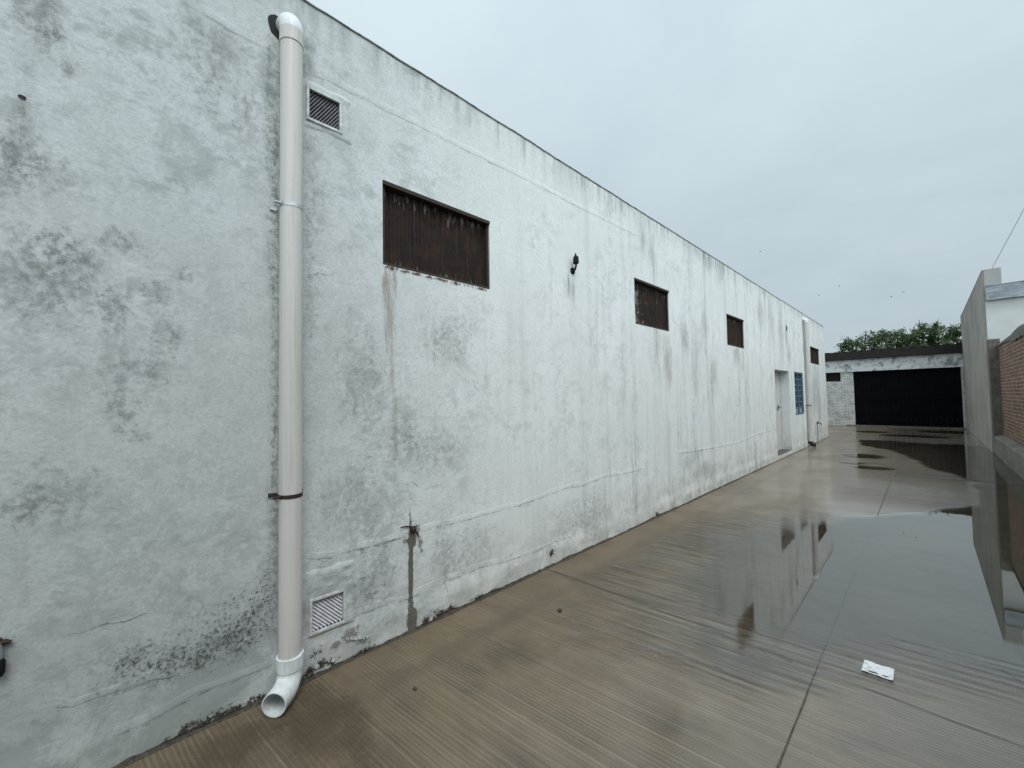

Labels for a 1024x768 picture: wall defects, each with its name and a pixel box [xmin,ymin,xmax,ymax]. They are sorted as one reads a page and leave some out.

crack [305,531,407,560]
damp [149,571,277,673]
peeling [301,625,376,678]
crack [113,661,271,736]